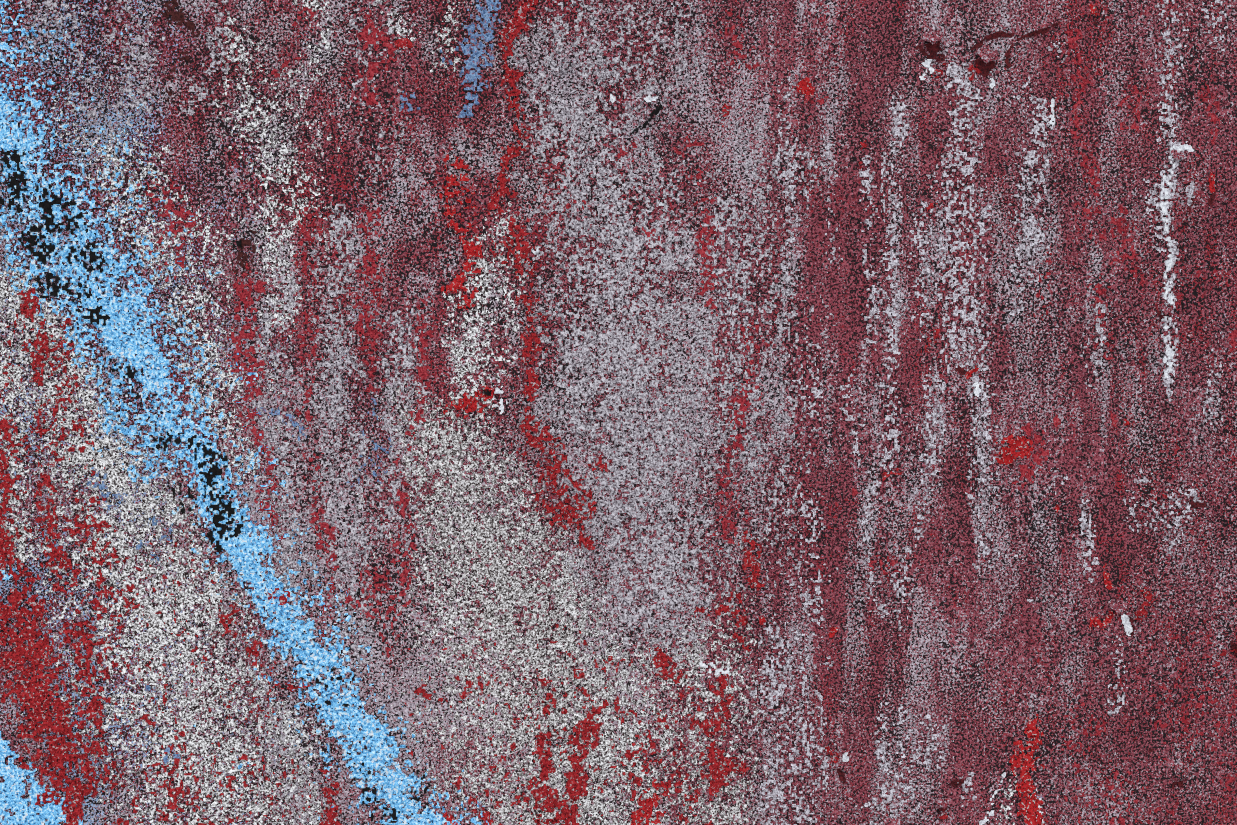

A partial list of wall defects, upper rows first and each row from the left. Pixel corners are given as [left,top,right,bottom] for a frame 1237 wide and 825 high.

spalling [916,30,999,92]
spalling [936,779,964,824]